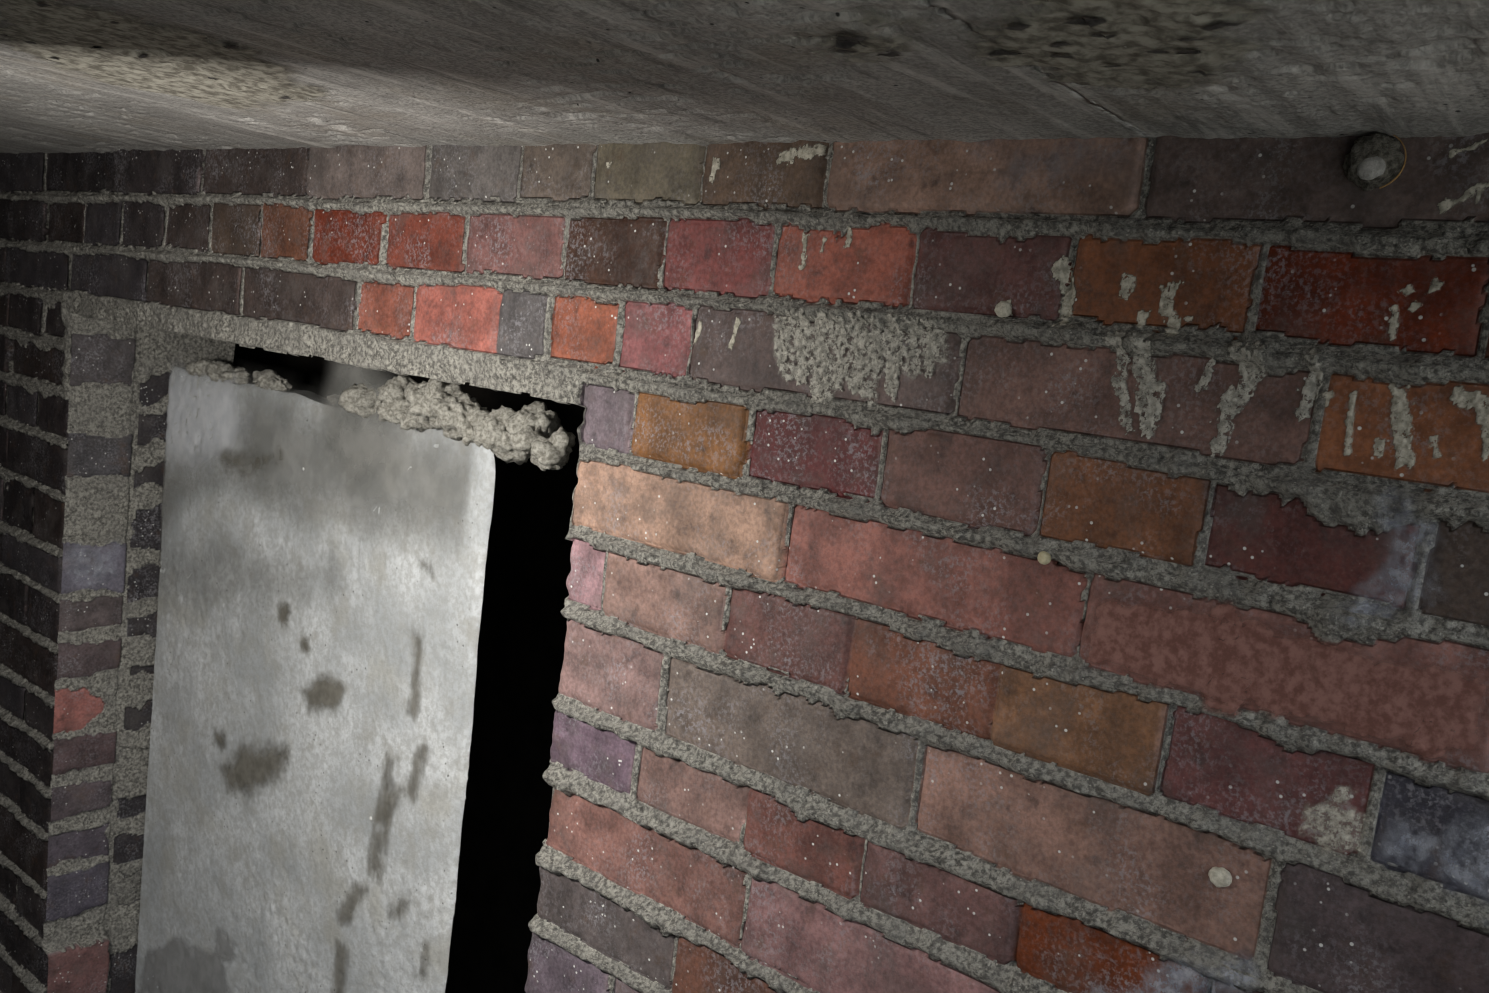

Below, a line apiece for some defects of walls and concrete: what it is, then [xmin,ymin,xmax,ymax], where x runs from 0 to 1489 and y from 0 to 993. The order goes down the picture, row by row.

efflorescence [1051,255,1076,327]
efflorescence [1105,273,1193,439]
efflorescence [1194,338,1266,457]
efflorescence [1295,346,1357,456]
efflorescence [1373,383,1441,469]
efflorescence [1450,385,1489,461]
damp [304,678,343,709]
damp [411,638,420,715]
damp [216,733,288,792]
damp [368,746,426,873]
damp [141,930,233,993]
damp [335,944,345,993]